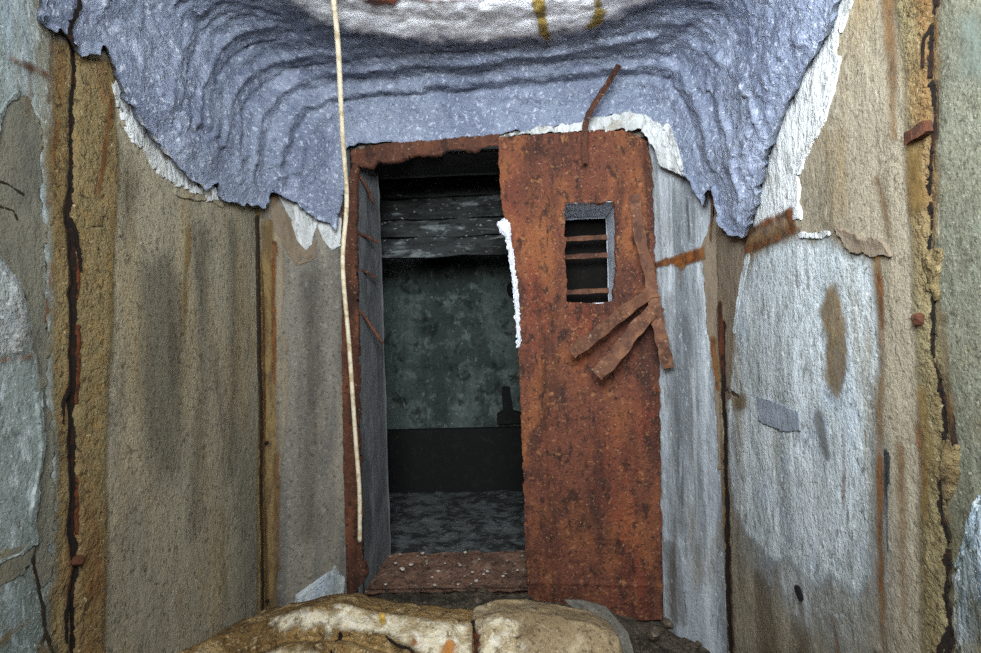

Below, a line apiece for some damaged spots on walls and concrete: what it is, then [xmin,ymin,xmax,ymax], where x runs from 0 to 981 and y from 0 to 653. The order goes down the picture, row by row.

peeling [112,80,224,207]
peeling [504,111,684,176]
crack [920,0,940,251]
peeling [0,91,58,588]
crack [31,0,83,653]
peeling [269,194,342,266]
rust [656,247,704,270]
rust [745,208,797,256]
crack [926,275,958,653]
peeling [951,494,981,653]